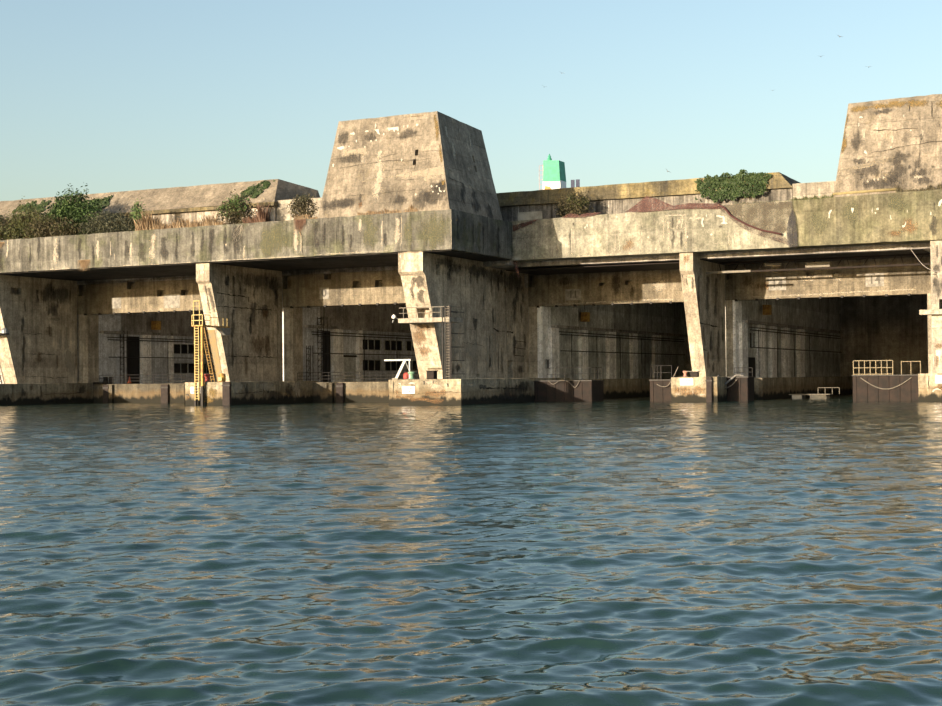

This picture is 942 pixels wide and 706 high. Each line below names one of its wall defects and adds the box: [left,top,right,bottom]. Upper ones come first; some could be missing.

leakage [340,154,364,163]
leakage [374,151,383,197]
leakage [852,129,934,189]
leakage [323,194,361,210]
leakage [78,226,302,267]
leakage [411,276,424,303]
leakage [438,258,529,401]